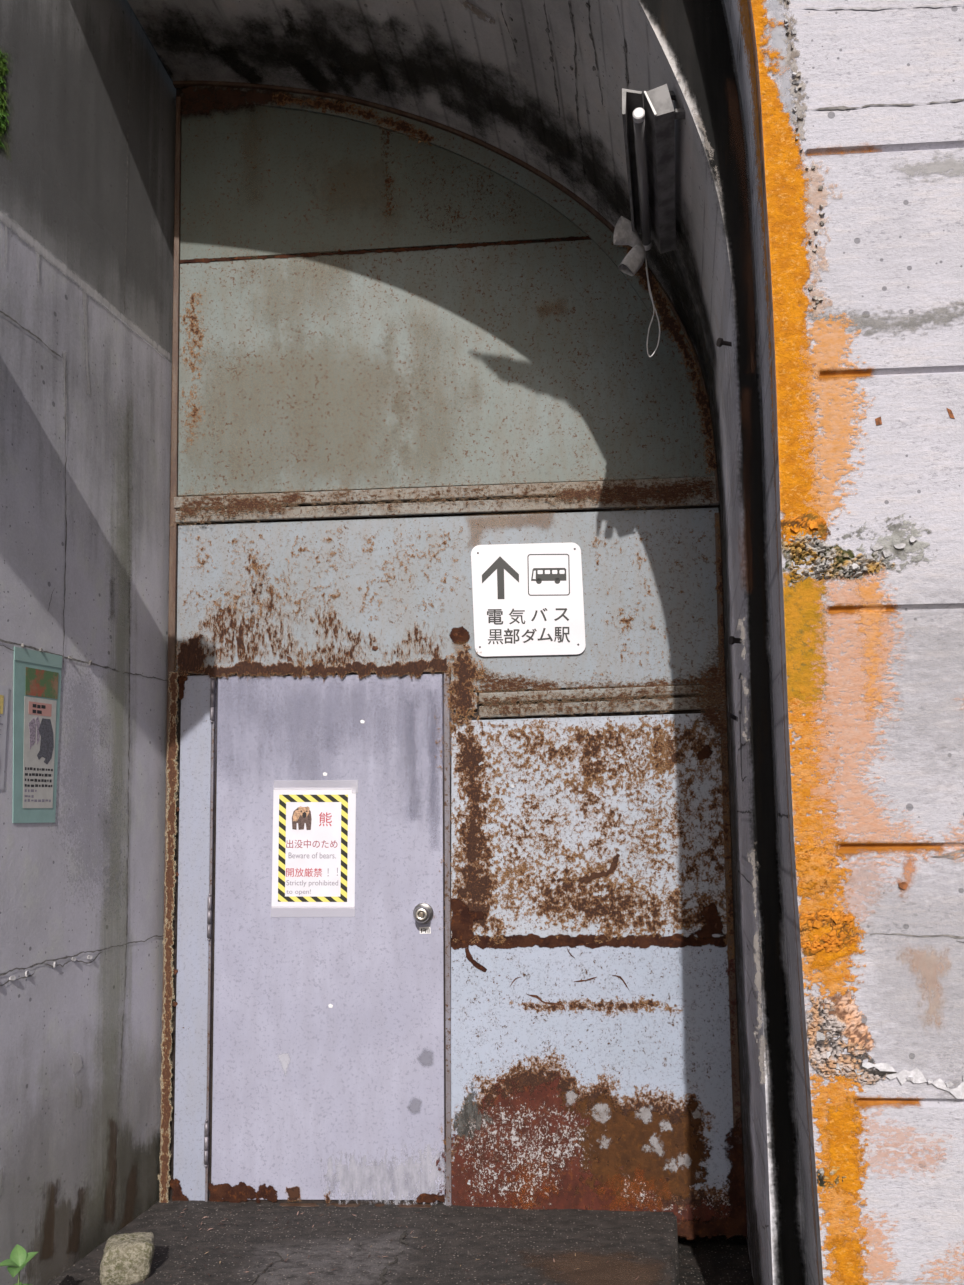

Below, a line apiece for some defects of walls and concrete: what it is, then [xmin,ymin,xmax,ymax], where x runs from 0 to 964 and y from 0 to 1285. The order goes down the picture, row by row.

spalling [781,511,937,587]
leakage [143,0,807,1285]
rust [158,262,748,1240]
crack [0,935,163,986]
spalling [806,987,964,1099]
leakage [25,1120,160,1285]